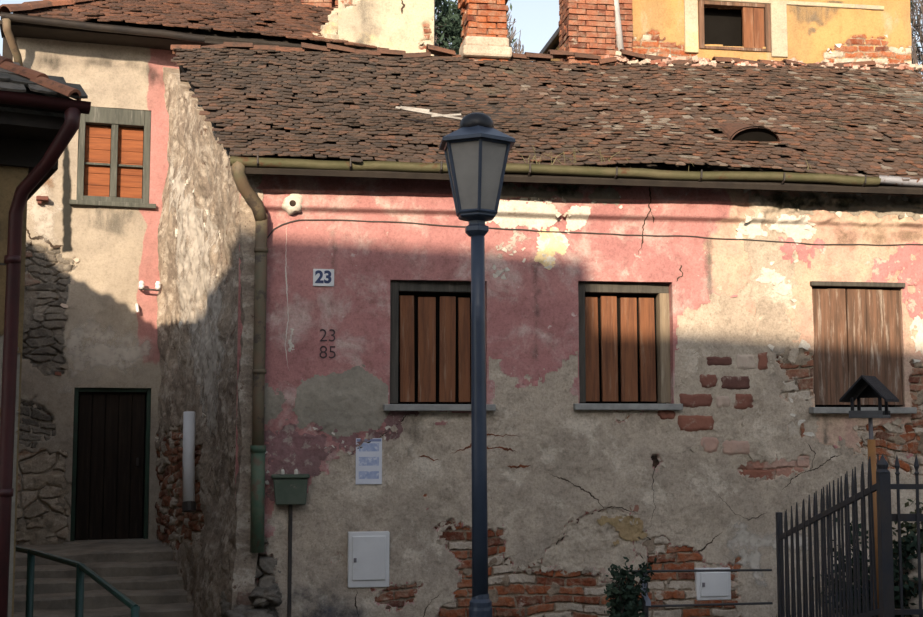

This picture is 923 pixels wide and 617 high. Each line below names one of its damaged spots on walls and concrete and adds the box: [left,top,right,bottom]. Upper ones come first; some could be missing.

peeling [823,34,912,64]
flaking render [7,174,79,617]
flaking render [154,426,204,554]
peeling [168,156,224,436]
peeling [236,411,472,617]
crack [419,433,667,564]
crack [638,186,654,255]
peeling [485,183,923,617]